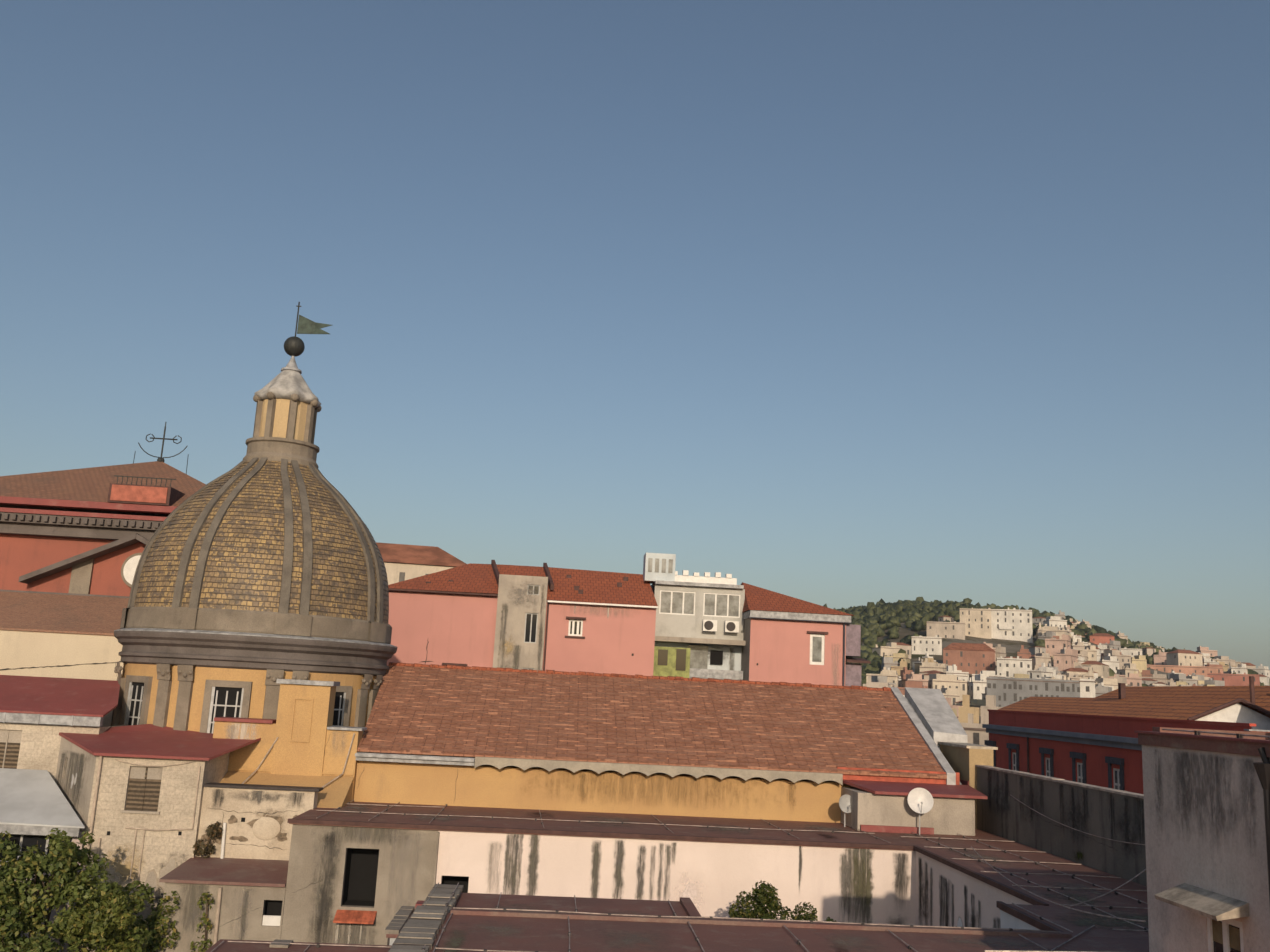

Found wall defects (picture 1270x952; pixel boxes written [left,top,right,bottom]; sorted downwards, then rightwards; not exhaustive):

water stain [314,827,396,944]
water stain [504,834,538,895]
water stain [592,844,600,898]
water stain [615,841,623,896]
water stain [637,843,676,899]
water stain [841,848,872,920]
water stain [895,854,1000,928]